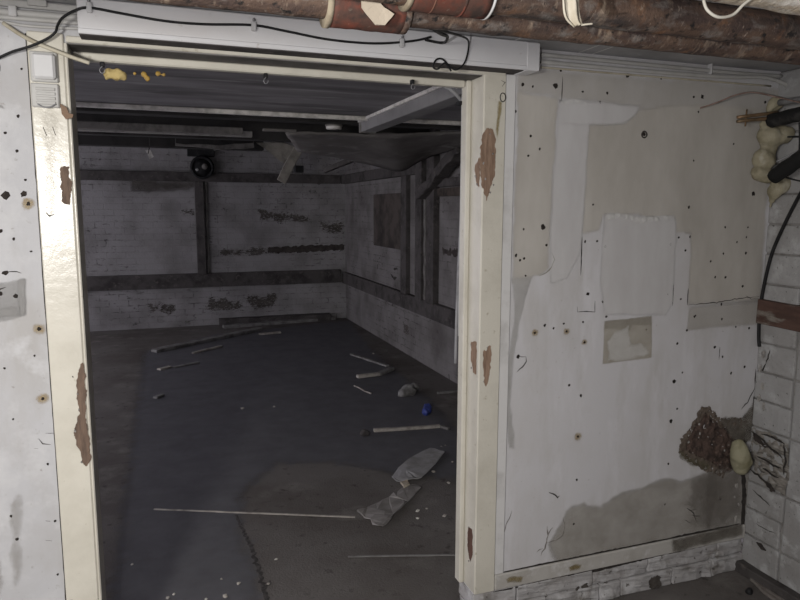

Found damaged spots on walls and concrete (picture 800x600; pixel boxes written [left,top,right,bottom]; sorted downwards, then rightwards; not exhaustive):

peeling [475,128,496,201]
peeling [470,341,492,386]
peeling [72,363,92,466]
spalling [679,383,790,496]
leakage [548,463,749,561]